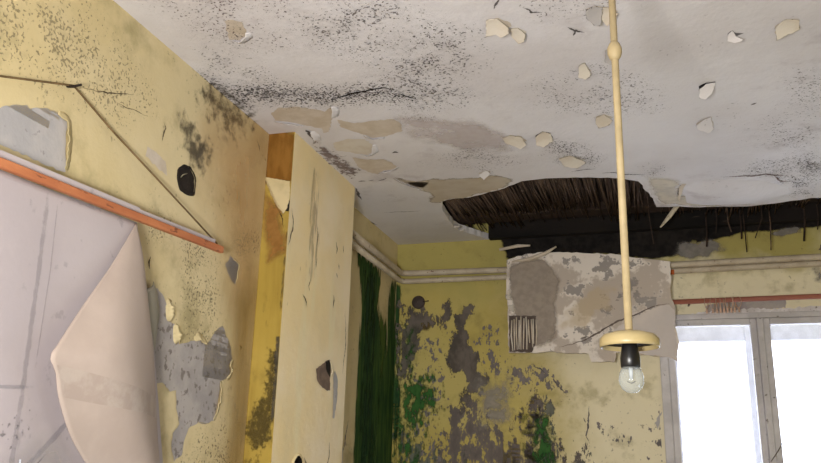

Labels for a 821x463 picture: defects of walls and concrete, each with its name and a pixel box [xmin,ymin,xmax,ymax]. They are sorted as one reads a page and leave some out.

peeling [586,5,618,26]
peeling [727,30,743,43]
peeling [699,82,716,99]
peeling [271,106,428,190]
leakage [401,140,518,203]
peeling [503,132,553,149]
crack [730,174,787,182]
leakage [740,69,821,198]
crack [562,304,664,347]
peeling [147,288,233,461]
leakage [232,337,280,463]
peeling [392,299,595,463]